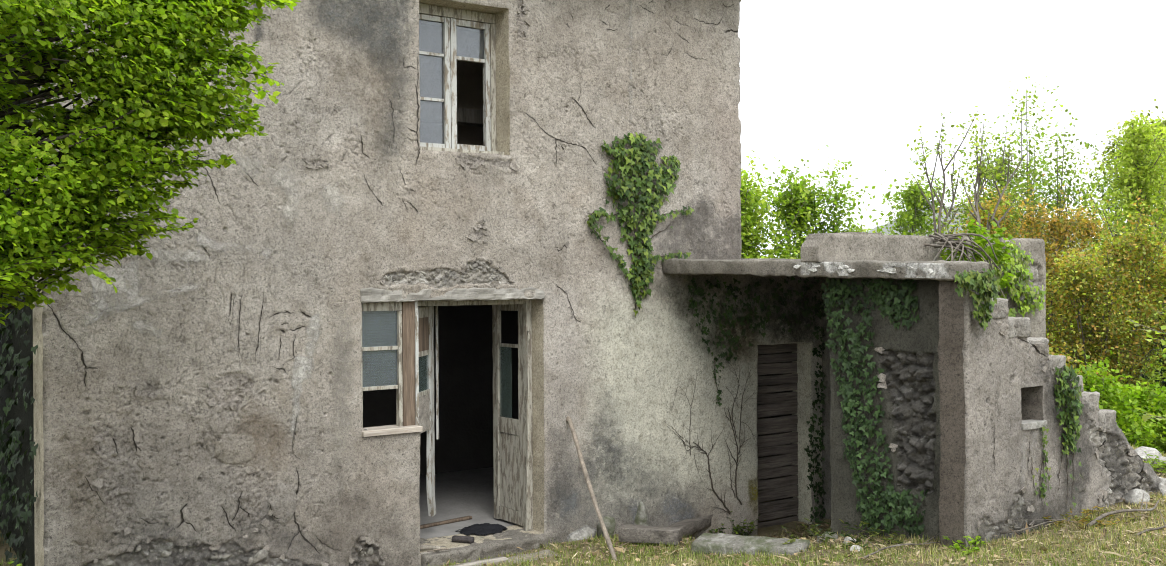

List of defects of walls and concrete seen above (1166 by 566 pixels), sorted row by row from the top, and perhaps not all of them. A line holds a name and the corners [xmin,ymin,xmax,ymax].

crack [640,0,738,60]
flaking render [380,260,516,288]
crack [47,304,98,386]
crack [230,294,312,373]
crack [141,504,197,532]
flaking render [84,423,329,566]
crack [222,492,250,531]
crack [285,401,340,554]
flaking render [349,536,386,566]
flaking render [1084,417,1155,507]